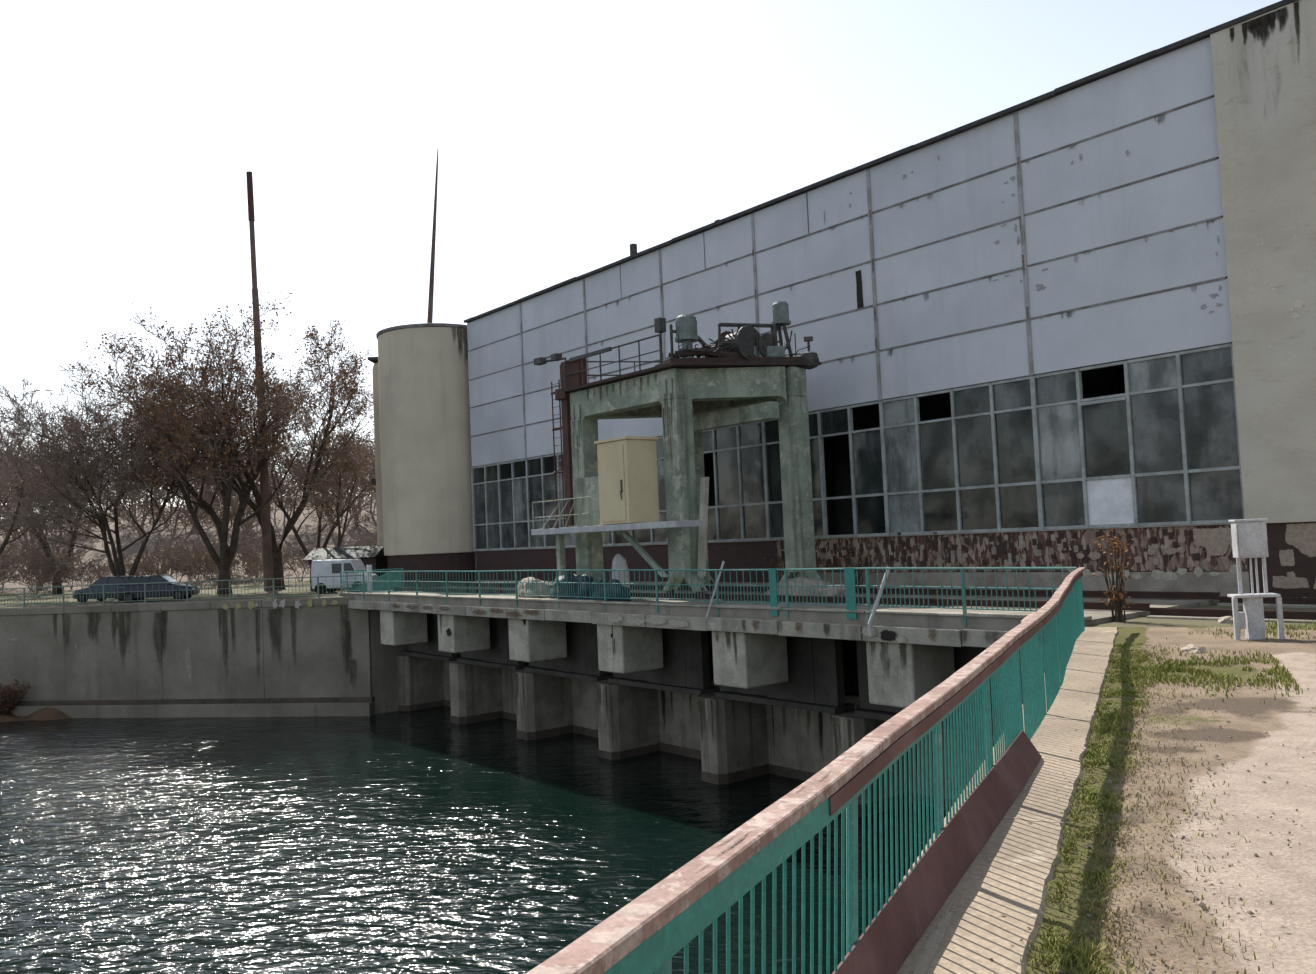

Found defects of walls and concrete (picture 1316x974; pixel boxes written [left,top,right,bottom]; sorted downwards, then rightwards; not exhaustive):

water stain [1230,2,1299,44]
spalling [1273,523,1316,589]
water stain [88,612,130,655]
water stain [154,611,167,656]
water stain [218,608,235,658]
water stain [255,606,295,652]
water stain [771,705,861,754]